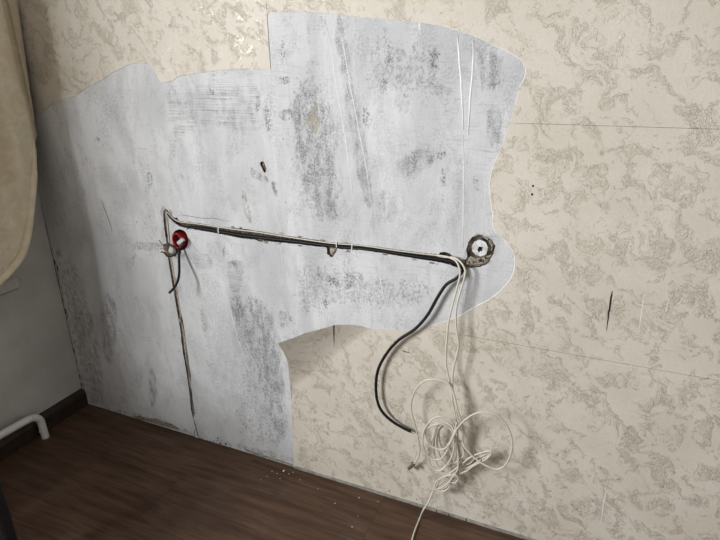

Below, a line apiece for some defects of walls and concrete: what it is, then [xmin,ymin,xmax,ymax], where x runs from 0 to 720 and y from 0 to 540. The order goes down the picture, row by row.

peeling [34,12,526,467]